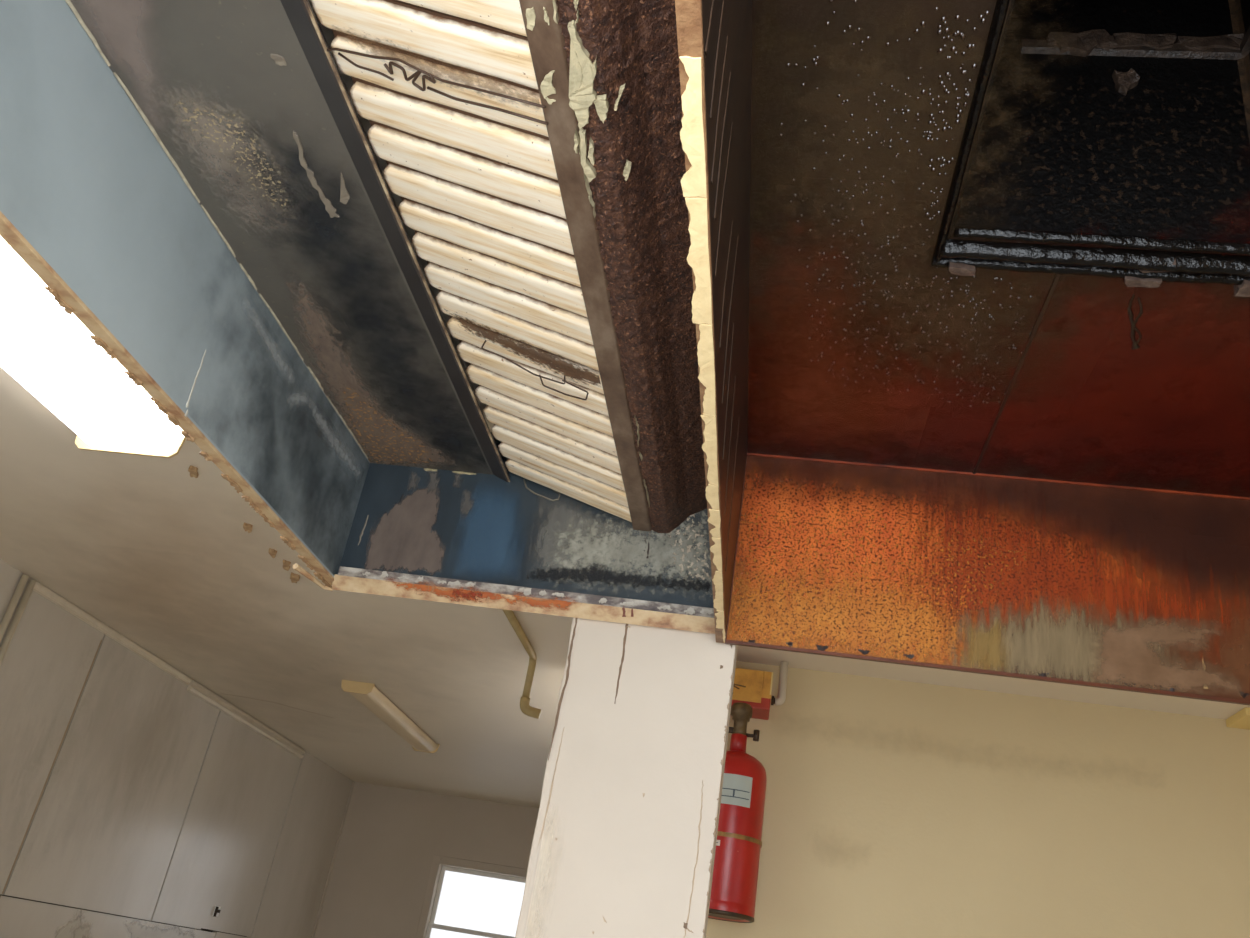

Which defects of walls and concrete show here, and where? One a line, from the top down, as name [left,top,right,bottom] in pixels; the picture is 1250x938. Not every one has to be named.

peeling [526,0,626,218]
peeling [65,0,368,459]
peeling [623,160,632,180]
peeling [45,286,75,315]
peeling [657,56,732,649]
peeling [125,371,213,478]
peeling [358,468,476,587]
rust [388,579,576,610]
peeling [516,587,566,598]
rust [729,470,1250,698]
crack [614,624,631,704]
crack [683,780,704,938]